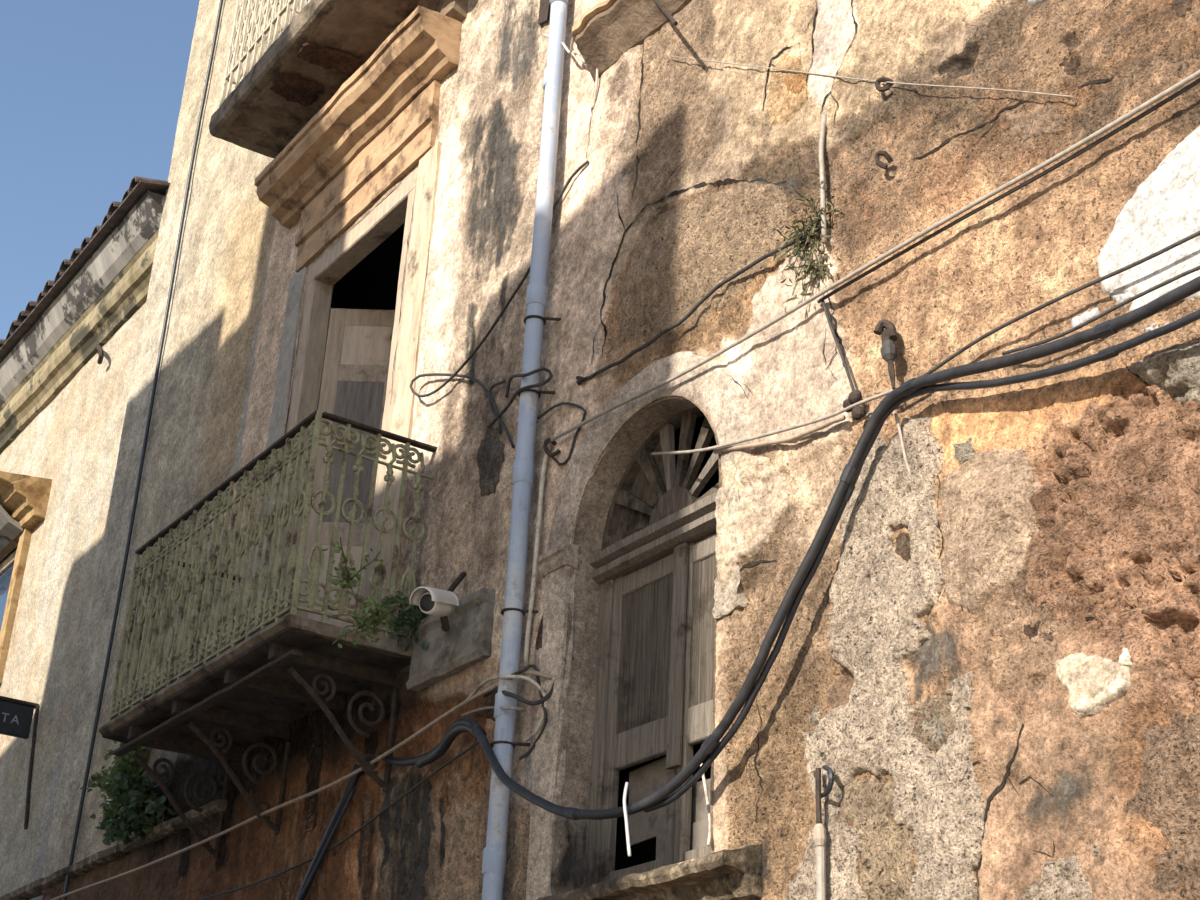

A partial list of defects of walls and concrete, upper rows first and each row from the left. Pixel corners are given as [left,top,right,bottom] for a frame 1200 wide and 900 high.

flaking render [270,43,363,107]
damp [465,100,523,318]
crack [591,40,787,362]
crack [763,0,857,128]
crack [907,95,1034,163]
damp [465,304,476,386]
peeling [784,415,985,900]
spalling [1020,342,1200,900]
damp [358,774,446,900]
crack [972,724,1052,900]